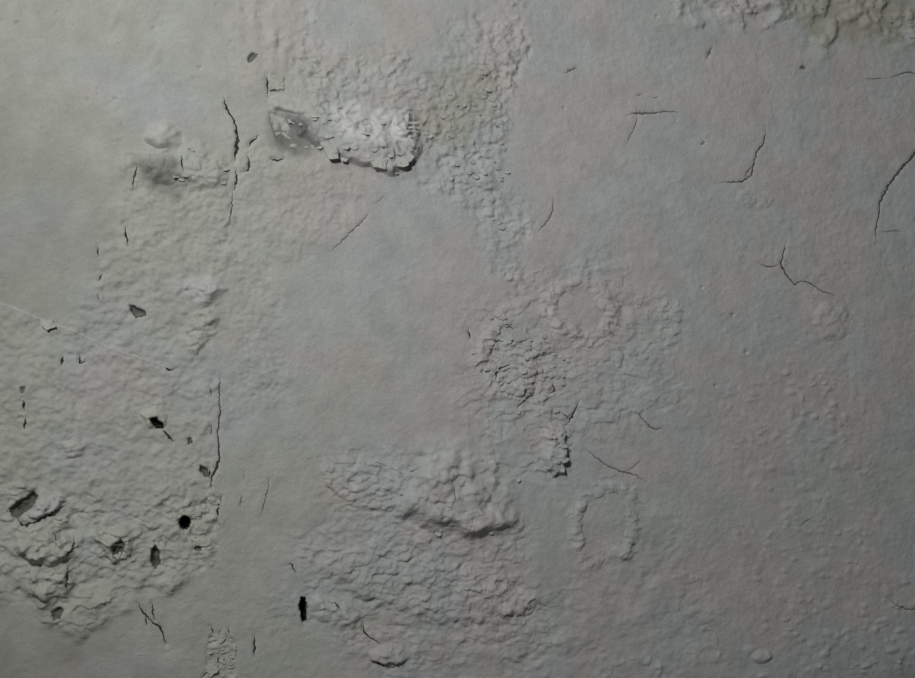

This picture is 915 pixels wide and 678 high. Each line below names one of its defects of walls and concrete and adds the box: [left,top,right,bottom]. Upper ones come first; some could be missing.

peeling [670,0,915,50]
crack [626,94,678,145]
crack [719,128,766,183]
crack [875,152,915,244]
crack [761,240,834,295]
peeling [205,627,237,678]